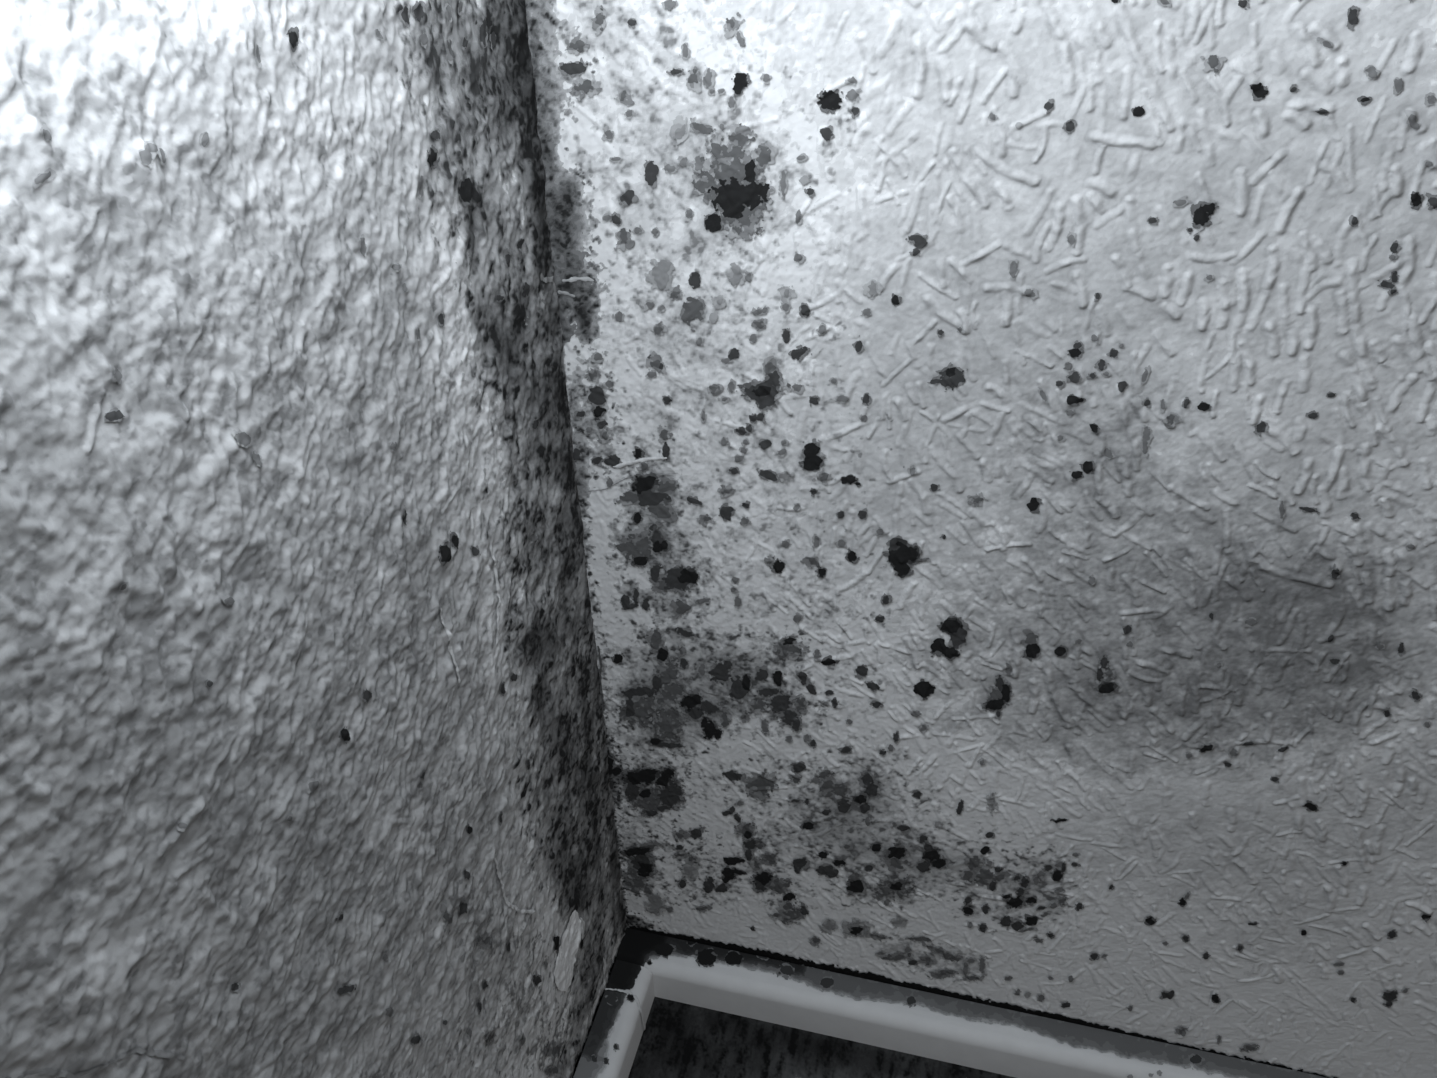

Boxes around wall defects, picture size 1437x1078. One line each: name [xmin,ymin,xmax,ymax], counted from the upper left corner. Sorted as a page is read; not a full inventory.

water stain [375,0,1437,1078]